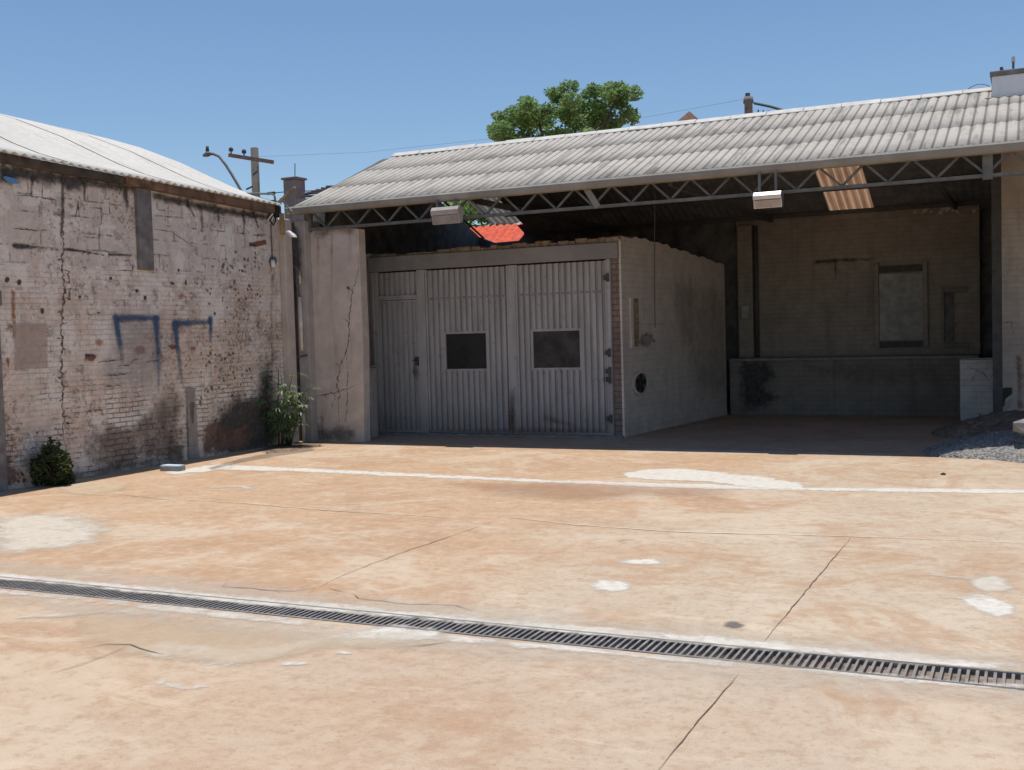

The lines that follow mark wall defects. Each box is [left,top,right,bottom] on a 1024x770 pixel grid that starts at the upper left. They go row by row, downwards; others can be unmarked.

crack [57,178,71,451]
flaking render [87,401,185,475]
flaking render [199,234,266,455]
leakage [212,364,273,453]
crack [320,254,359,432]
leakage [740,362,774,410]